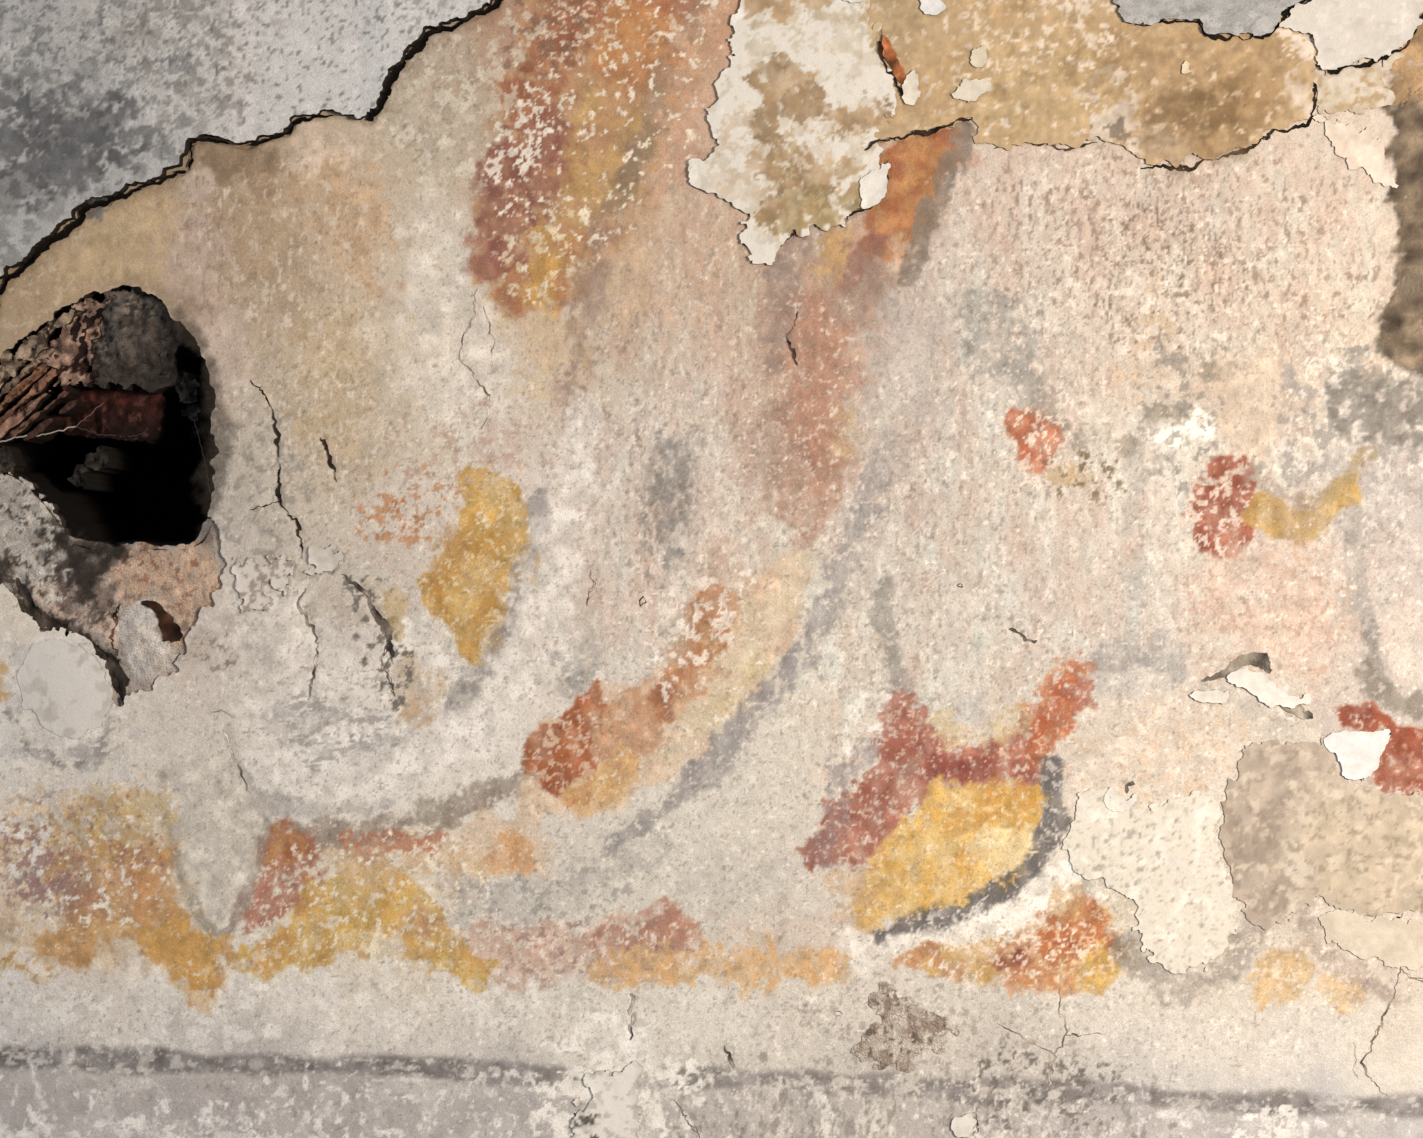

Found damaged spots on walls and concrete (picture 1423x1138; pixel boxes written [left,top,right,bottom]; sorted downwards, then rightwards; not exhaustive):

flaking render [688,0,1423,266]
spalling [0,285,345,707]
crack [250,380,319,700]
crack [320,437,337,482]
crack [343,574,395,696]
peeling [1189,652,1313,719]